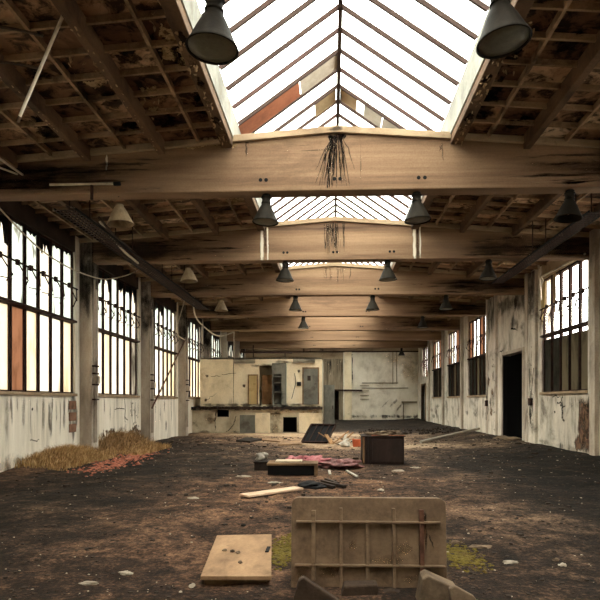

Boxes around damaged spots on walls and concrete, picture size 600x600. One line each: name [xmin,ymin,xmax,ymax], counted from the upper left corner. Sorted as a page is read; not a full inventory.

peeling [149,12,240,150]
peeling [455,74,493,145]